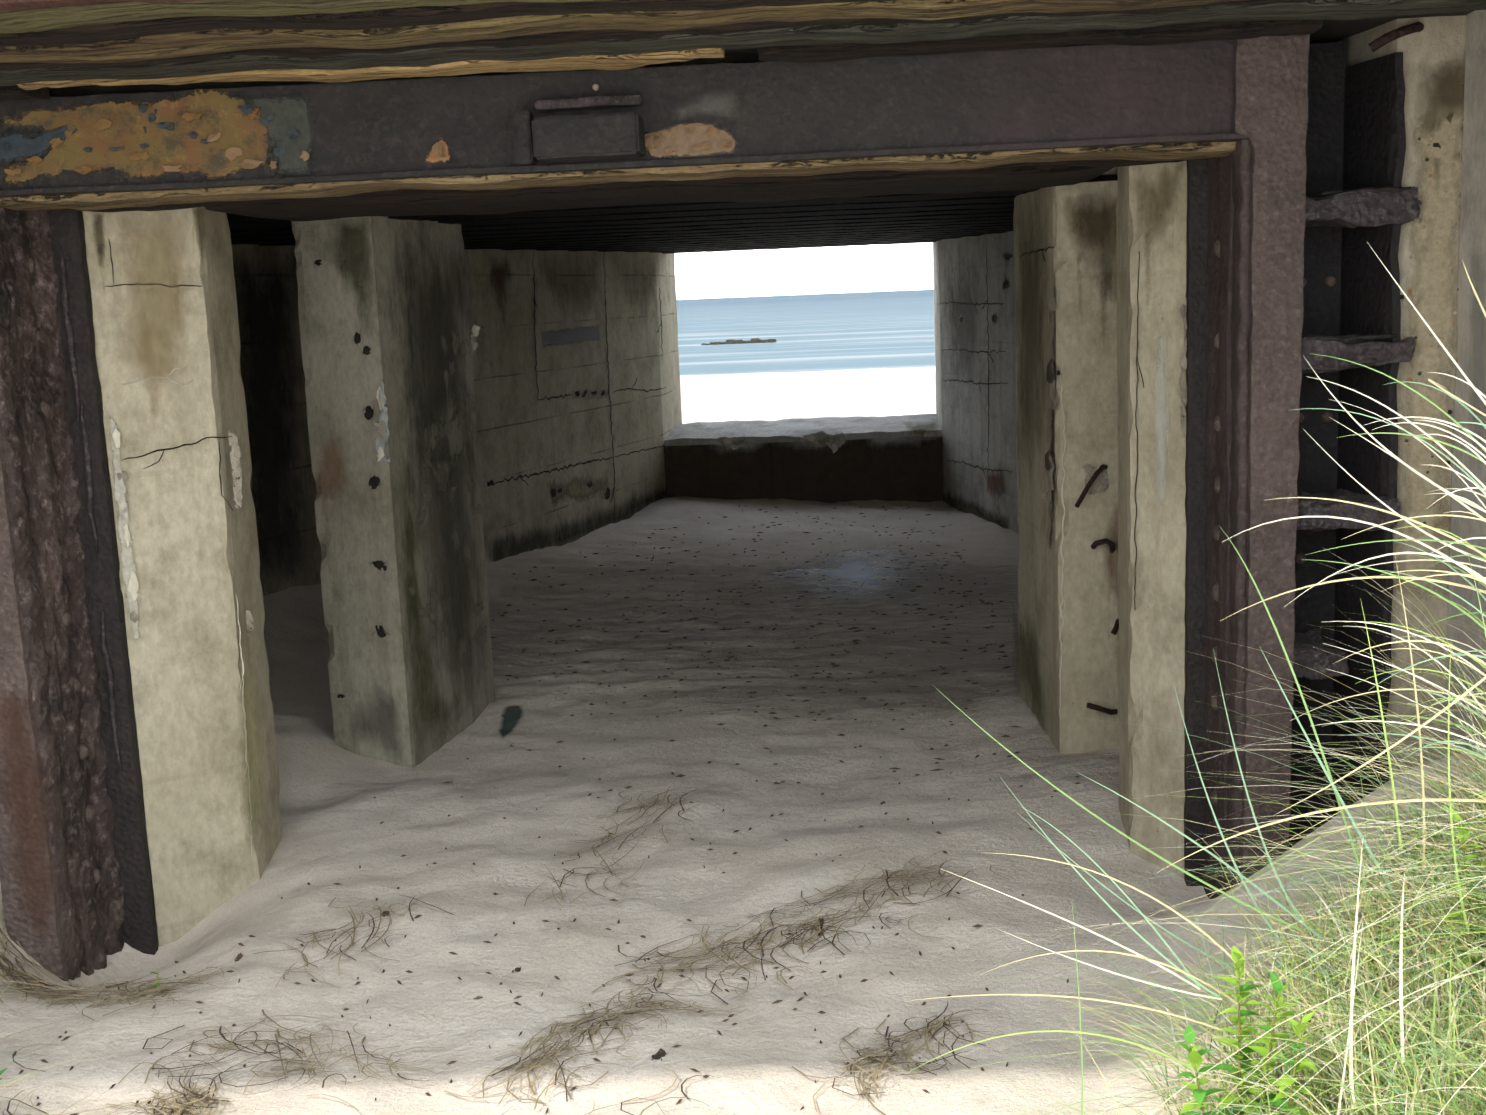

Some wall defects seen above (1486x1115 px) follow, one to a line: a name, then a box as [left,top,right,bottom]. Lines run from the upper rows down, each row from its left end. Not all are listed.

peeling [0,89,314,184]
peeling [425,139,450,163]
peeling [645,122,735,158]
damp [1073,203,1116,288]
crack [121,436,234,511]